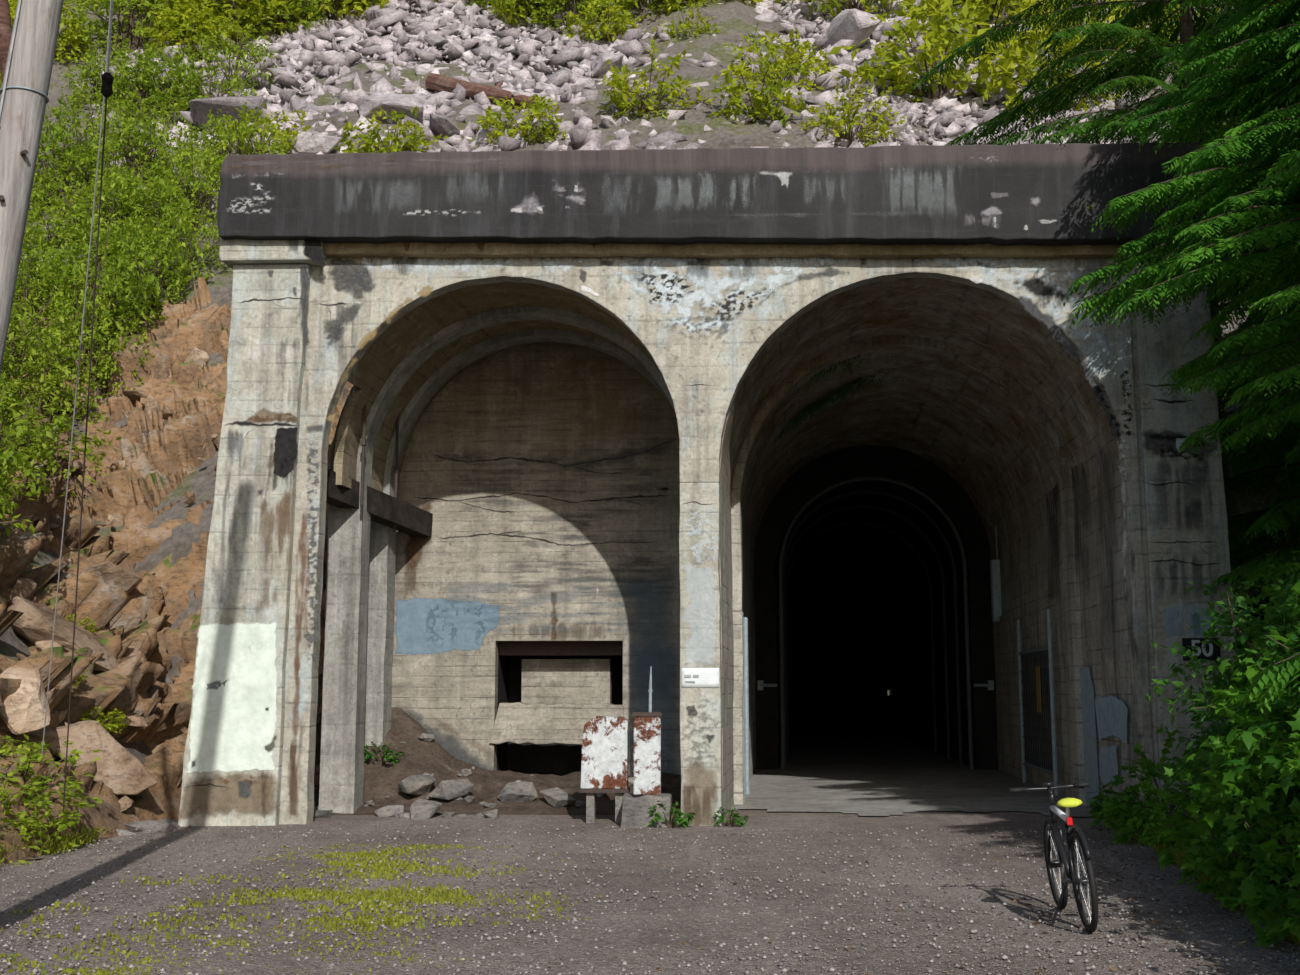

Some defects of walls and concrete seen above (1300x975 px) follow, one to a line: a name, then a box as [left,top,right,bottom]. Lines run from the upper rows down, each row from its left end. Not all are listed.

leakage [357,257,438,318]
spalling [538,261,599,296]
peeling [602,257,825,332]
leakage [340,329,376,385]
crack [414,440,714,546]
corrosion [261,494,310,788]